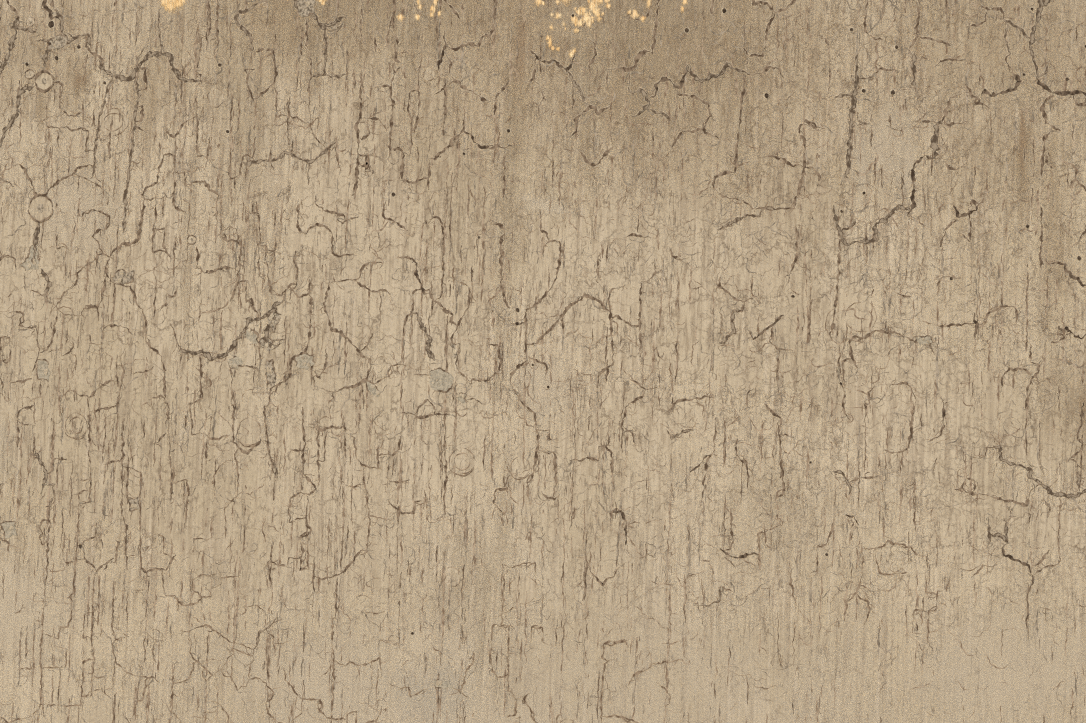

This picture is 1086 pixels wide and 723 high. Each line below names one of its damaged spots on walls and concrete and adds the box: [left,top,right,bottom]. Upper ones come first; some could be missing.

crack [580,194,610,231]
crack [952,357,976,418]
crack [0,532,34,574]
crack [389,657,428,708]
crack [418,651,429,676]
crack [548,690,570,723]
crack [680,700,725,723]
crack [701,646,777,704]
crack [792,669,839,723]
crack [943,681,1009,723]
crack [1029,590,1086,715]